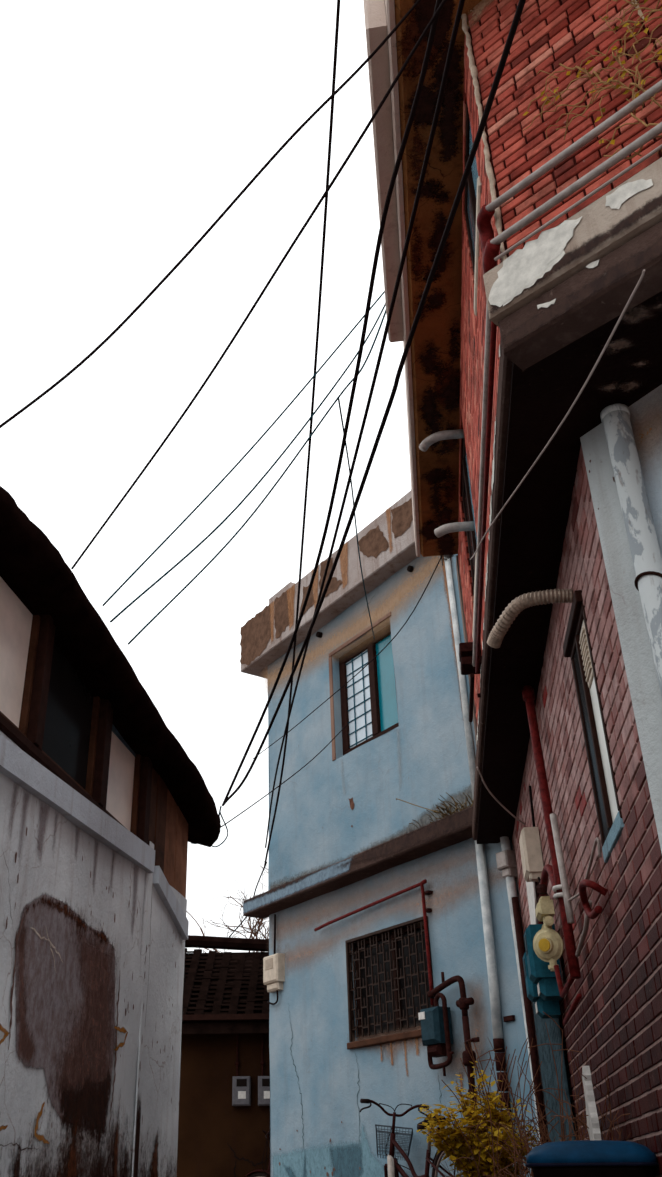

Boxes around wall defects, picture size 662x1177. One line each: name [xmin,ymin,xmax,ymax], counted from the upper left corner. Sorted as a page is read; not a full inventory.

damp [396,8,464,322]
peeling [488,217,582,307]
peeling [605,179,653,209]
peeling [240,497,413,665]
damp [265,318,462,702]
damp [0,914,178,1177]